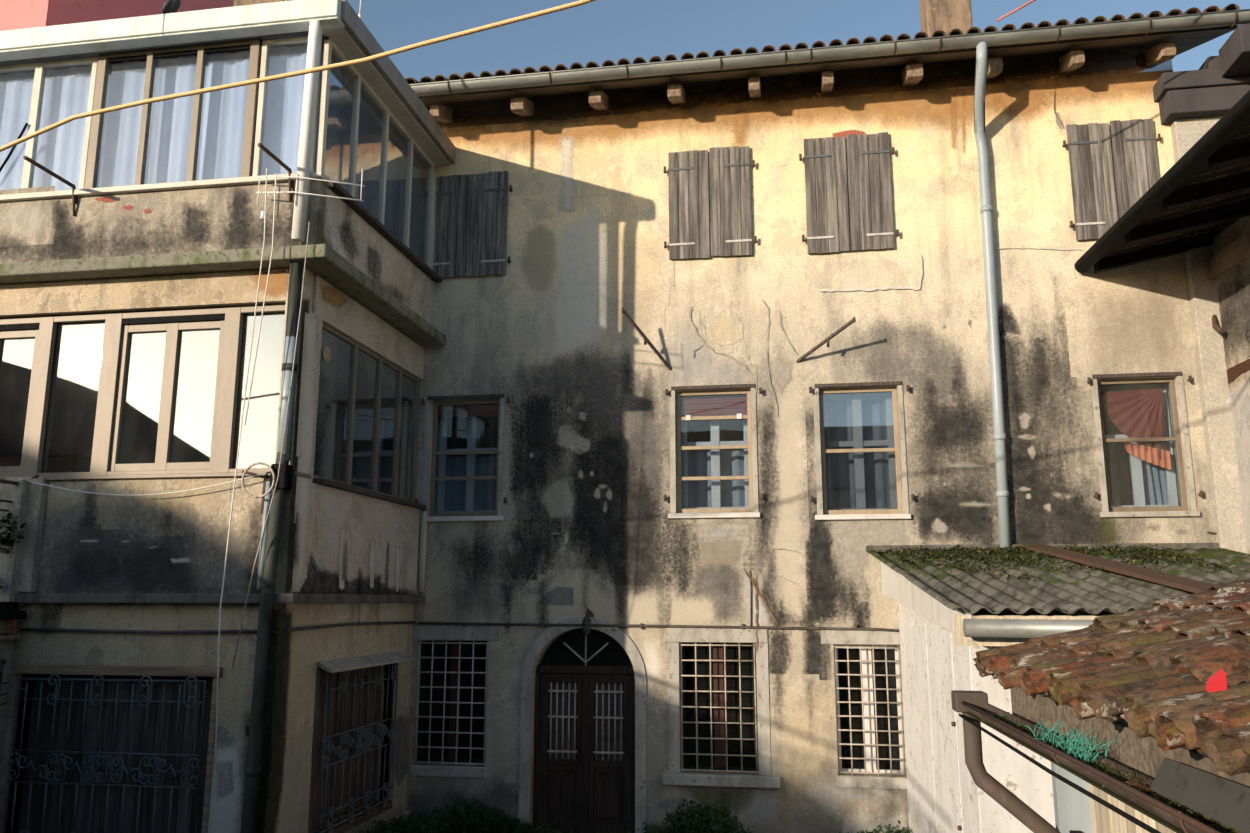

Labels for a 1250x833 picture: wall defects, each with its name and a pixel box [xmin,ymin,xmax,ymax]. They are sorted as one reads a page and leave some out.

mould [0,189,297,262]
mould [313,213,379,284]
leakage [36,490,261,741]
leakage [263,609,311,833]
leakage [292,515,416,623]
mould [453,355,739,628]
leakage [752,412,909,833]
leakage [866,323,994,545]
leakage [999,263,1198,544]